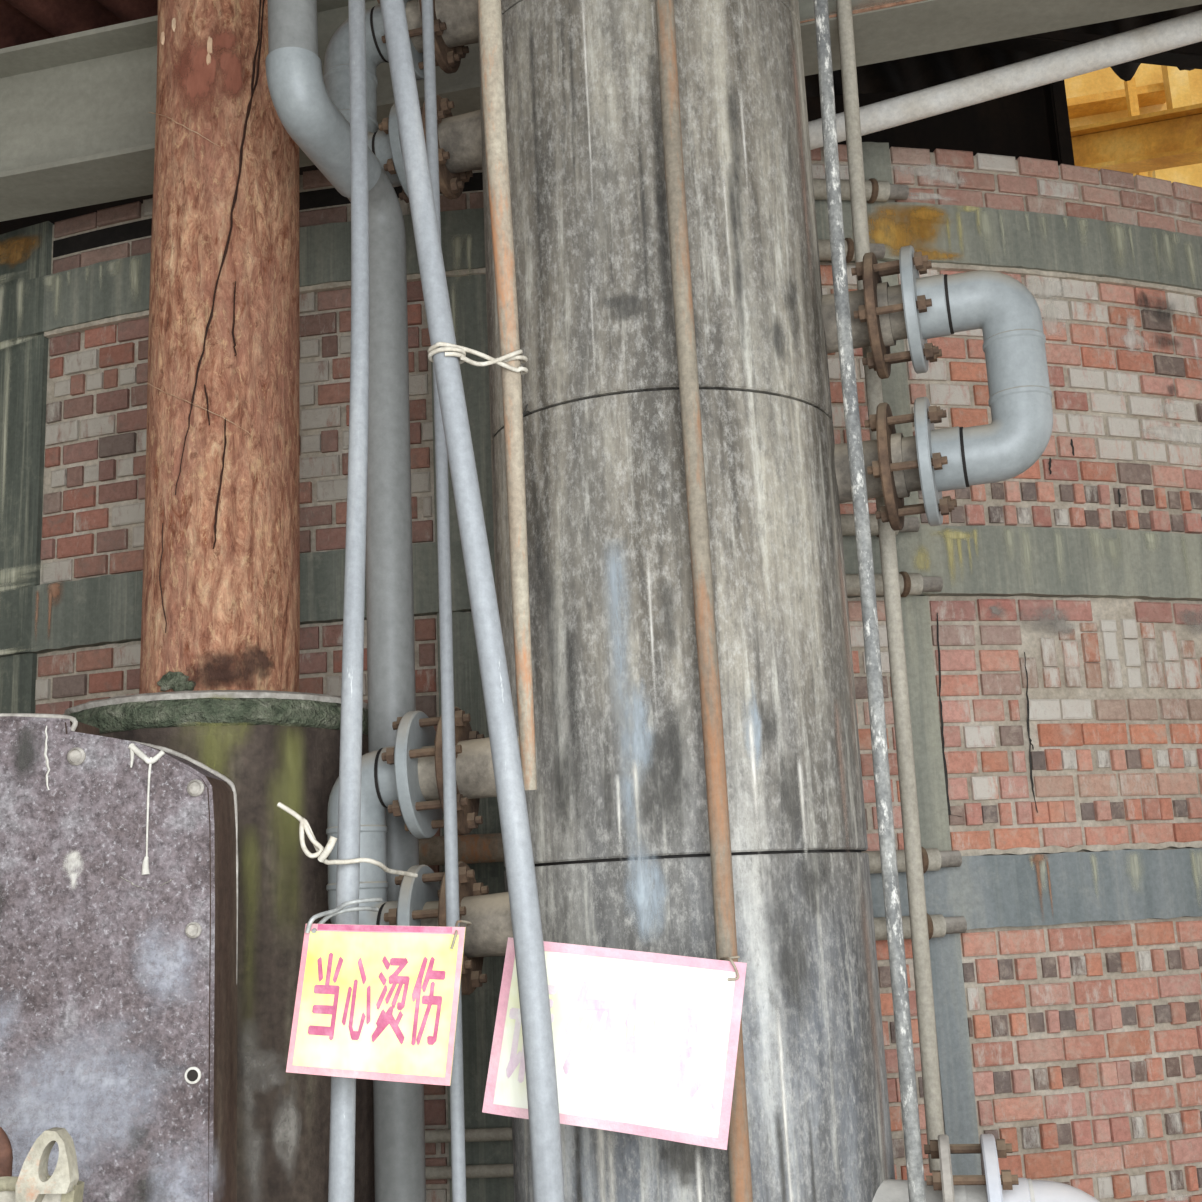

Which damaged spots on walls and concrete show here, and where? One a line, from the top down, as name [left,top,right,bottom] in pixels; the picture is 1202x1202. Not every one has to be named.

rust [0,237,37,264]
crack [148,0,265,549]
rust [869,207,956,260]
crack [159,523,167,633]
damp [196,648,273,682]
crack [1024,652,1038,813]
rust [1032,854,1052,905]